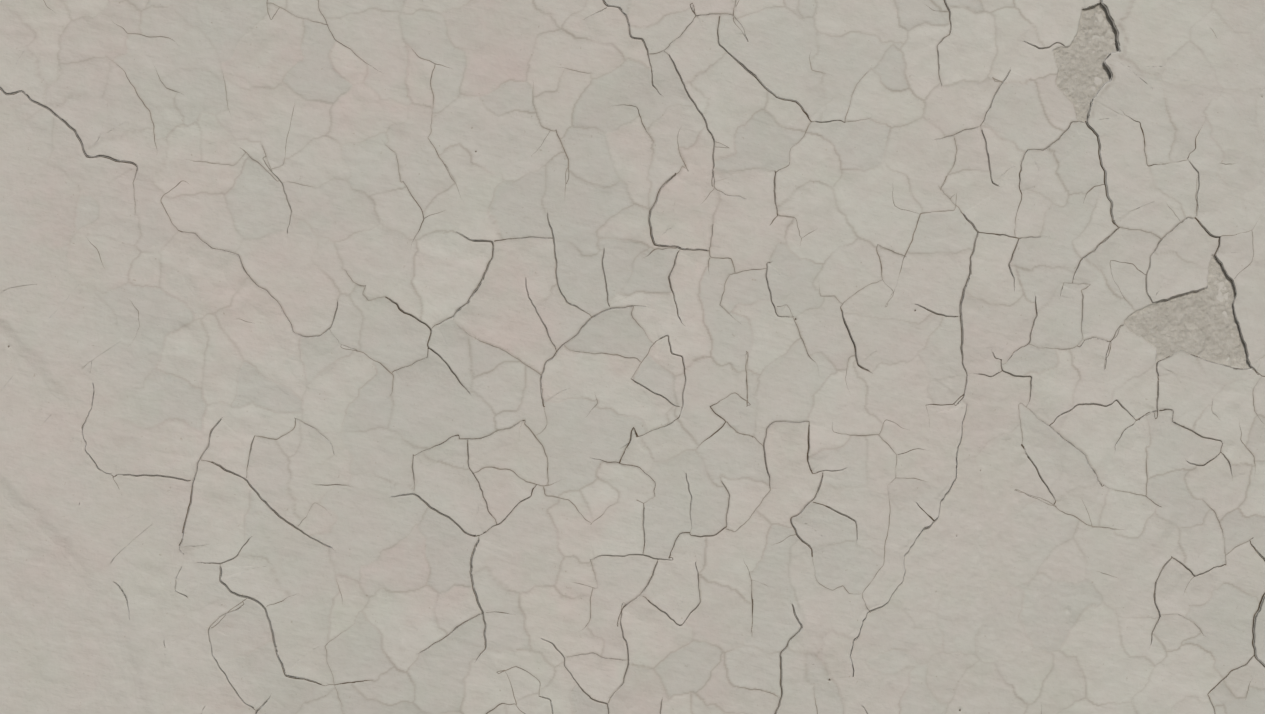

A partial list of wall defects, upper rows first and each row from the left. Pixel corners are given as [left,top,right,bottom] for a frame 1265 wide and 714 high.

crack [614,0,748,182]
crack [923,0,980,87]
peeling [1023,0,1169,227]
crack [1008,111,1255,364]
crack [133,49,1084,632]
peeling [840,306,879,373]
peeling [915,196,1265,453]
peeling [763,421,878,557]
crack [1137,367,1265,478]
crack [201,598,286,714]
peeling [1151,546,1226,650]
peeling [1252,593,1265,667]